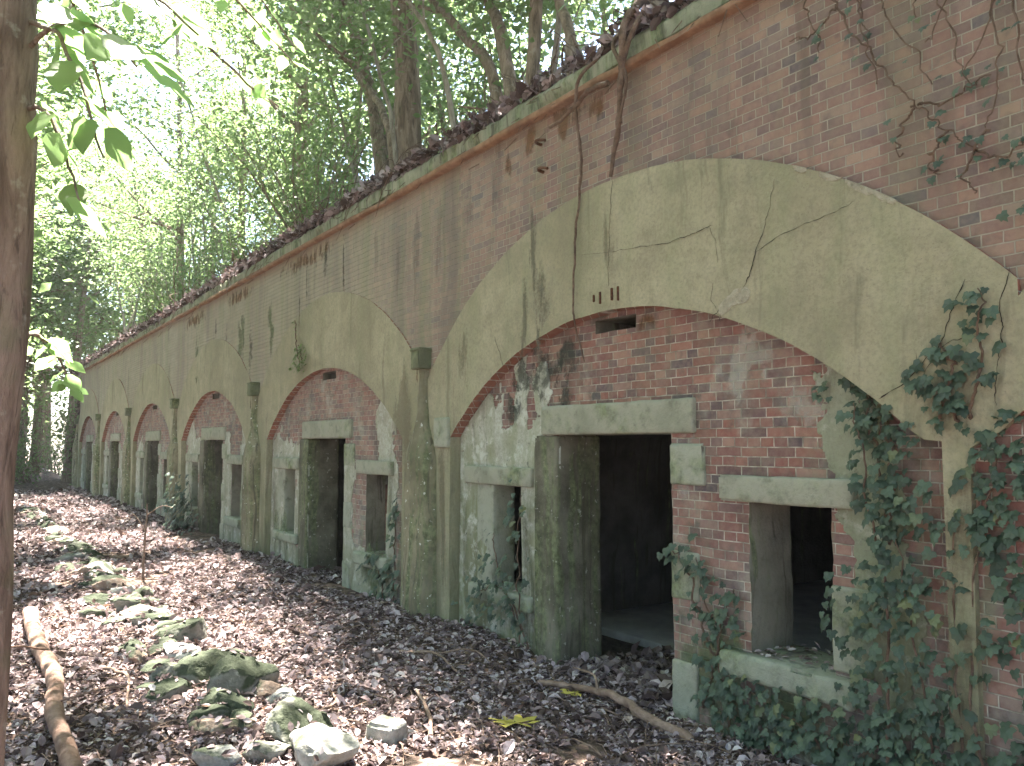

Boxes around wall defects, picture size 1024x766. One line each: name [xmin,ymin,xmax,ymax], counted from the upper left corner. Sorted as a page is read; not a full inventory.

leakage [506,214,579,423]
crack [584,181,720,321]
crack [744,186,852,286]
crack [879,267,1010,406]